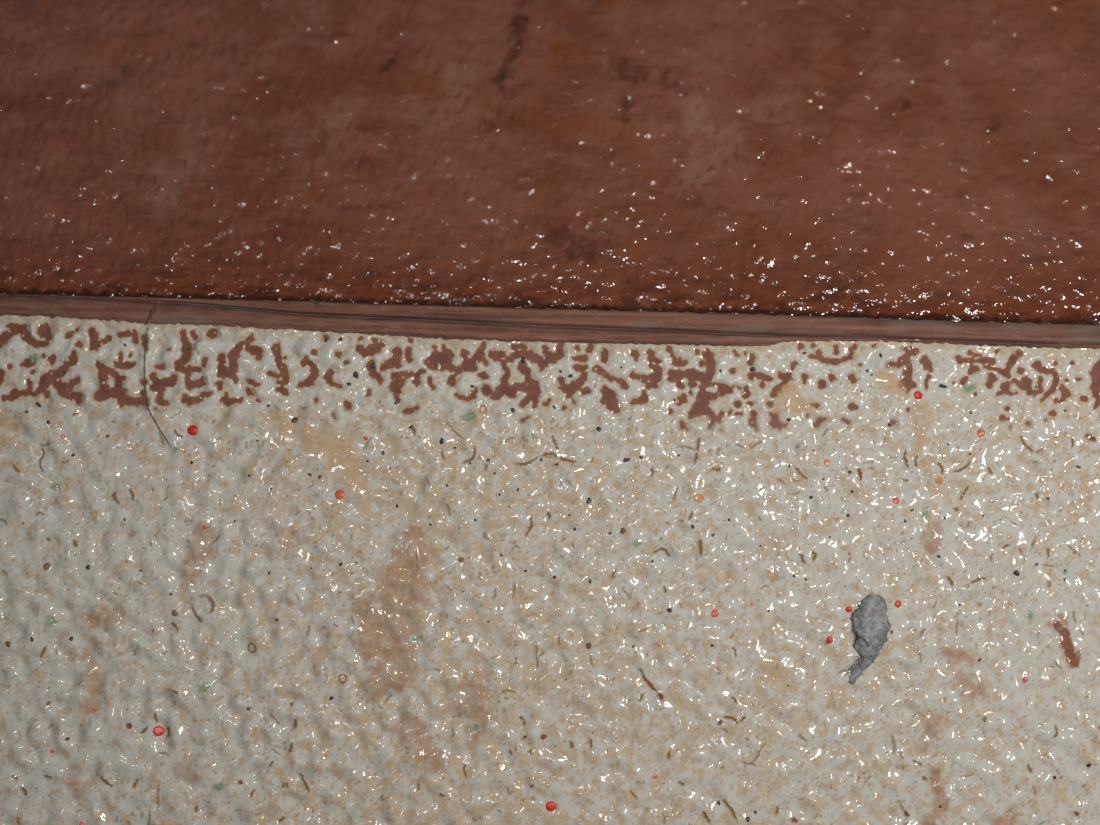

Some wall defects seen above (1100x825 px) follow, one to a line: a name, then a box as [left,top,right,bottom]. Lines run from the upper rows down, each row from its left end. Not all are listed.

crack [143,302,180,449]
peeling [0,323,862,416]
peeling [888,346,933,393]
peeling [953,349,1100,421]
rust [1044,611,1083,669]